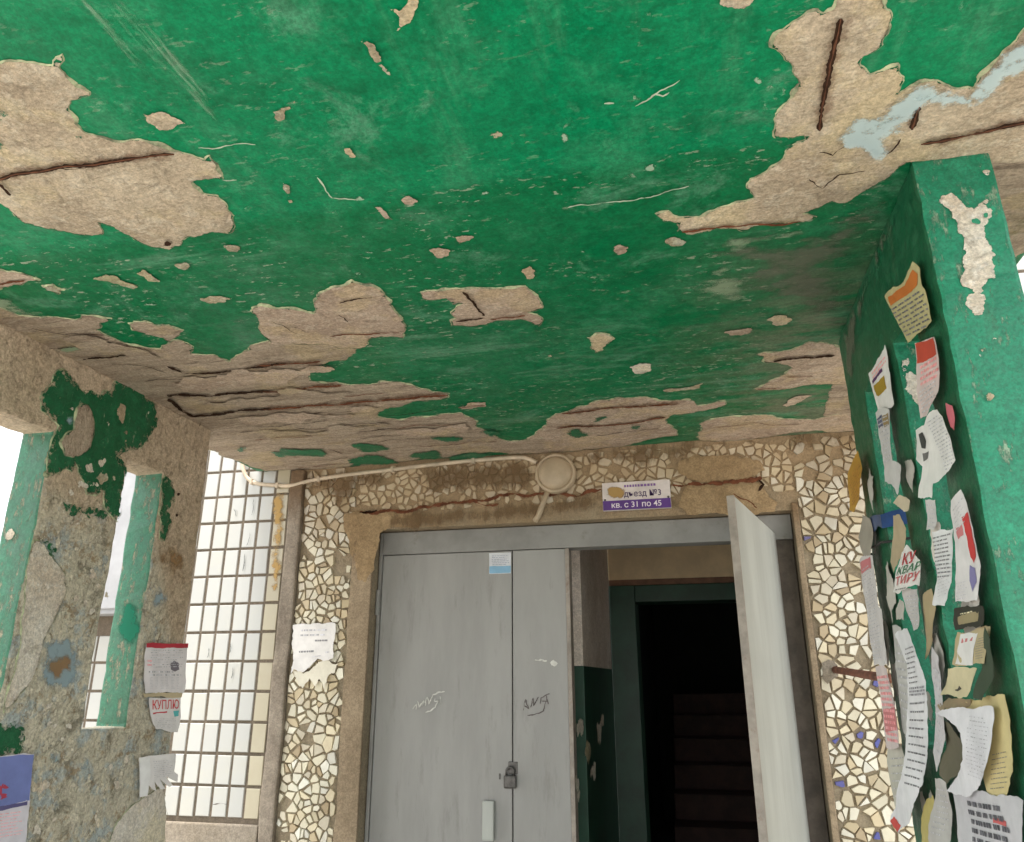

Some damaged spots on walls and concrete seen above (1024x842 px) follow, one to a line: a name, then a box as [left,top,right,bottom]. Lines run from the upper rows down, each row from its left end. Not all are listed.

spalling [0,53,240,252]
spalling [655,0,1024,315]
spalling [0,266,854,525]
peeling [158,475,175,541]
crack [359,488,601,515]
peeling [0,540,95,756]
peeling [118,603,140,643]
peeling [109,784,168,842]